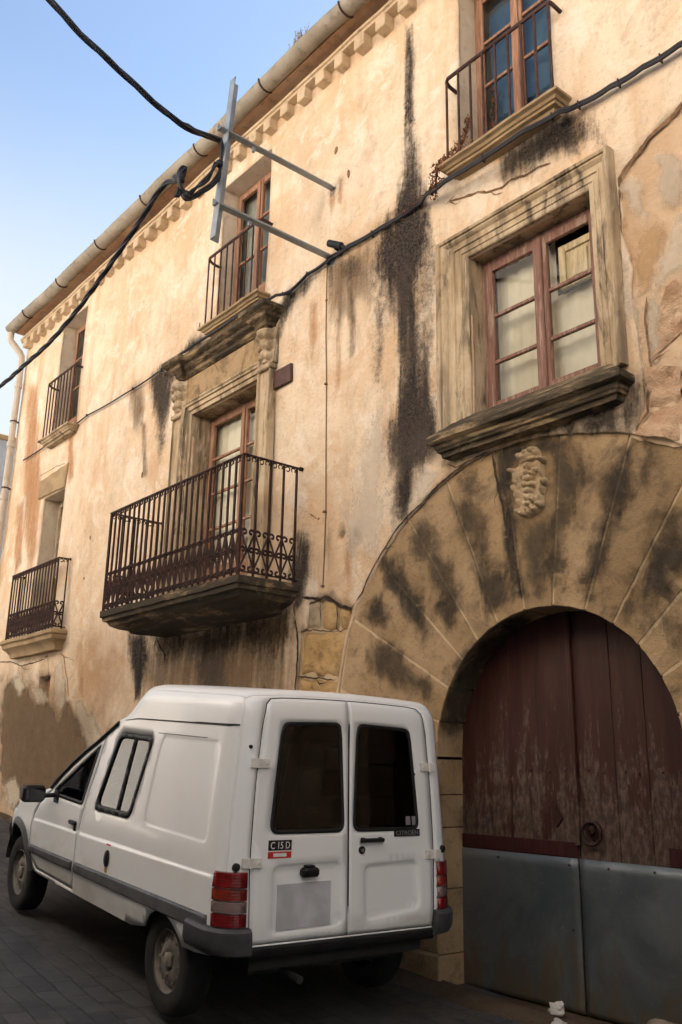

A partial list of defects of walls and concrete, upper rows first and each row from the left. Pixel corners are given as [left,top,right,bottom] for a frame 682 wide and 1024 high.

crack [447,163,550,205]
water stain [500,112,588,181]
water stain [330,30,457,630]
peeling [620,107,682,447]
water stain [133,369,174,450]
water stain [456,380,645,612]
water stain [128,533,310,700]
water stain [366,643,431,696]
water stain [443,617,534,735]
water stain [629,510,682,612]
peeling [0,661,101,811]